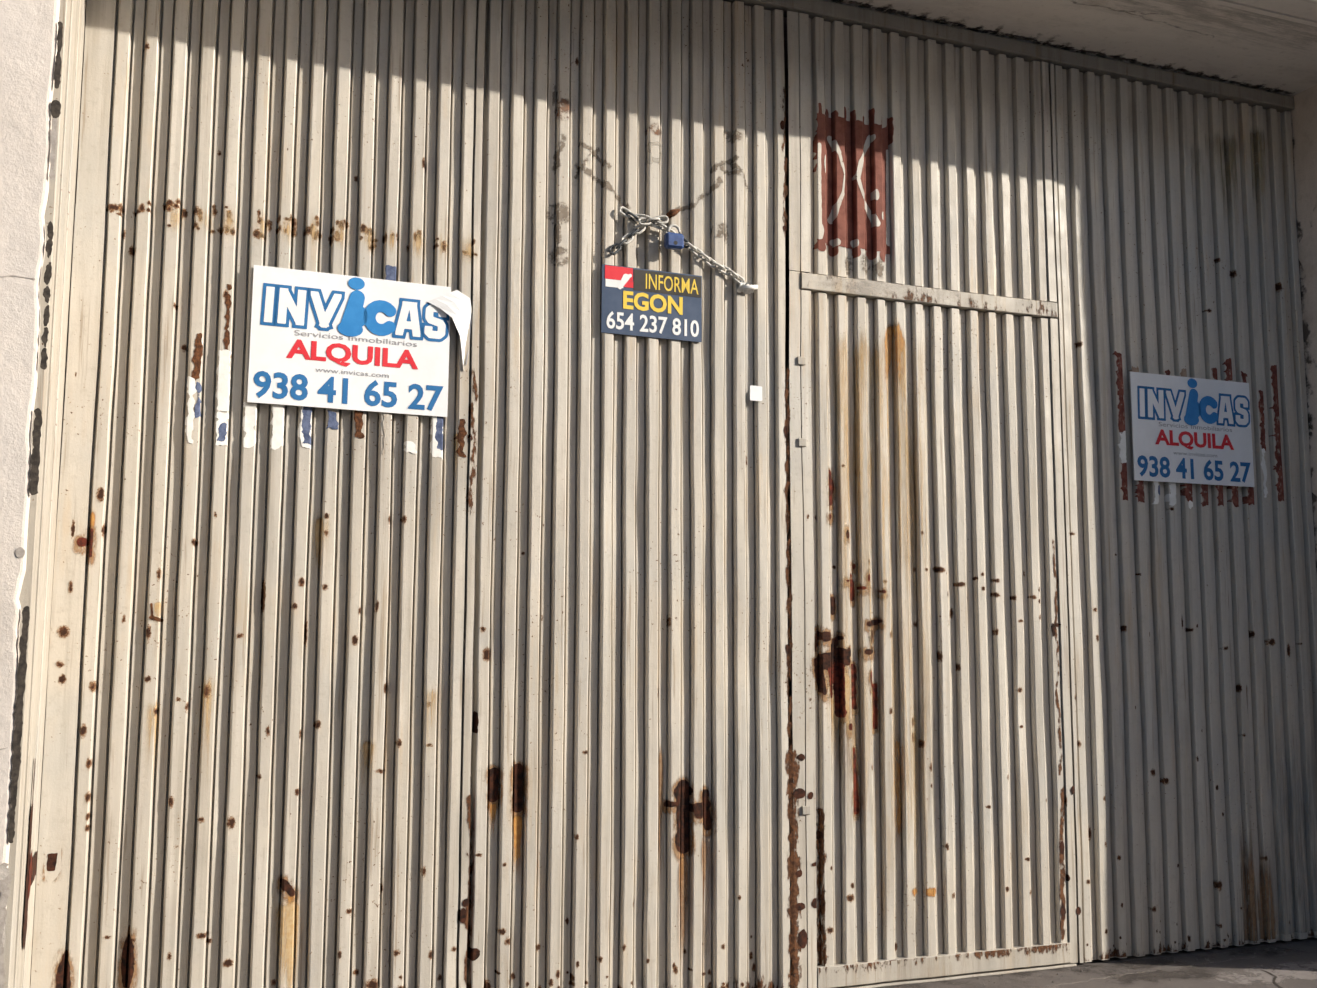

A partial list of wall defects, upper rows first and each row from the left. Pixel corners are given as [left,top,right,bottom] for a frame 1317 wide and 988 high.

corrosion [106,198,236,257]
corrosion [253,210,447,253]
corrosion [454,370,478,516]
corrosion [807,324,907,546]
corrosion [658,369,1081,988]
corrosion [363,742,384,773]
corrosion [487,761,528,866]
corrosion [451,794,588,988]
corrosion [55,949,74,988]
corrosion [104,925,137,988]
corrosion [353,969,378,988]